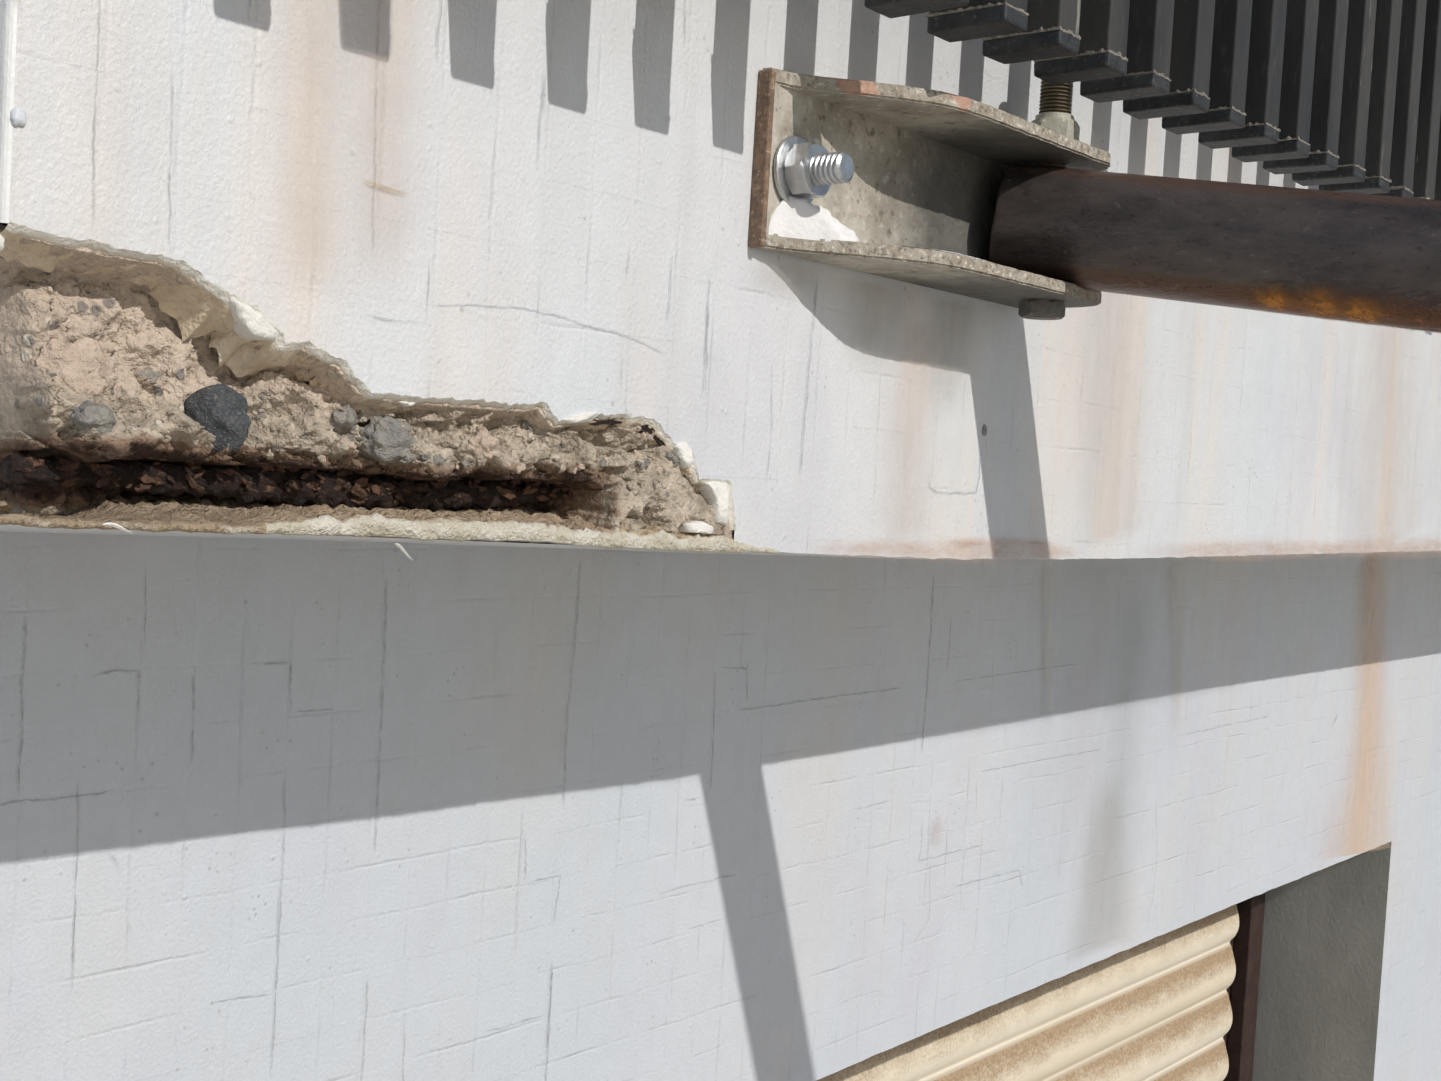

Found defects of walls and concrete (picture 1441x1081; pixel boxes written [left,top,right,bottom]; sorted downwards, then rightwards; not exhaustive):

spalling [0,222,779,560]
corrosion [1259,294,1441,328]